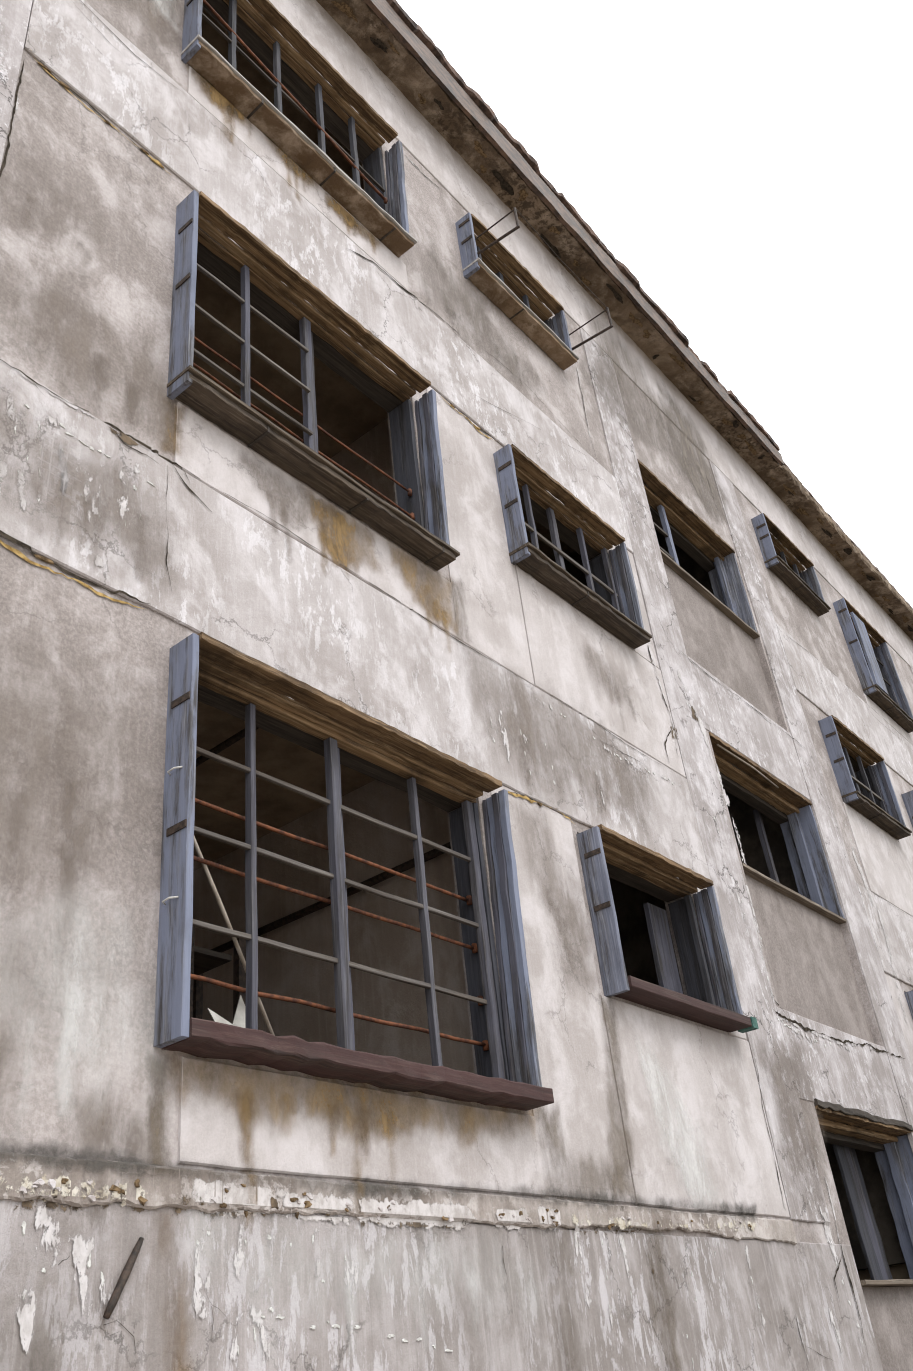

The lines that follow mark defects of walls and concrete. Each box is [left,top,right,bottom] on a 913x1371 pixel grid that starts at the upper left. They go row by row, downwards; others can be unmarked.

crack [0,59,27,177]
crack [351,250,459,333]
crack [0,352,801,765]
flaking render [175,1178,477,1326]
flaking render [496,1206,766,1327]
peeling [229,1305,285,1362]